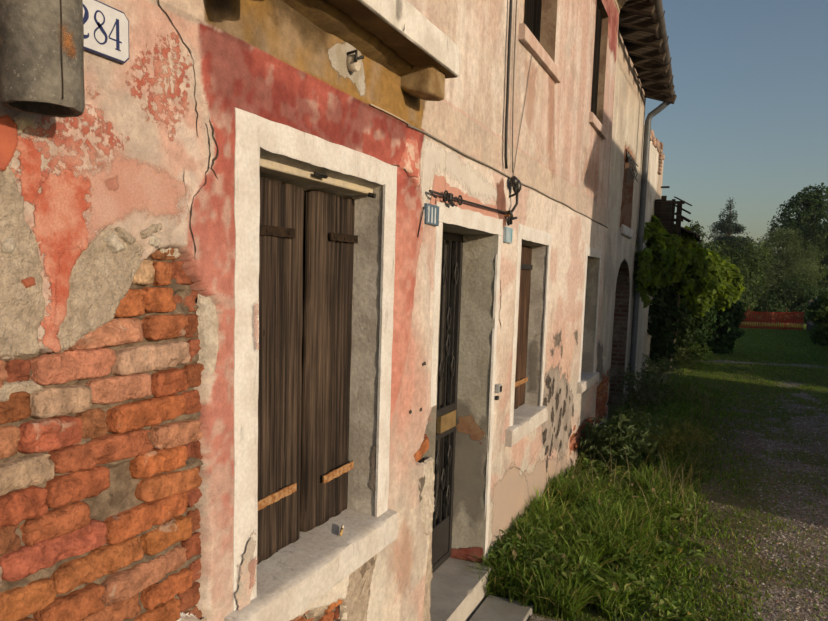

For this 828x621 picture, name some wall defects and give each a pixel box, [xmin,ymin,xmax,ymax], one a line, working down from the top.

peeling [125,32,193,141]
crack [158,0,219,259]
peeling [328,42,366,96]
flaking render [0,93,219,621]
peeling [290,554,377,621]
peeling [369,445,377,492]
spalling [420,457,435,621]
peeling [542,328,609,473]